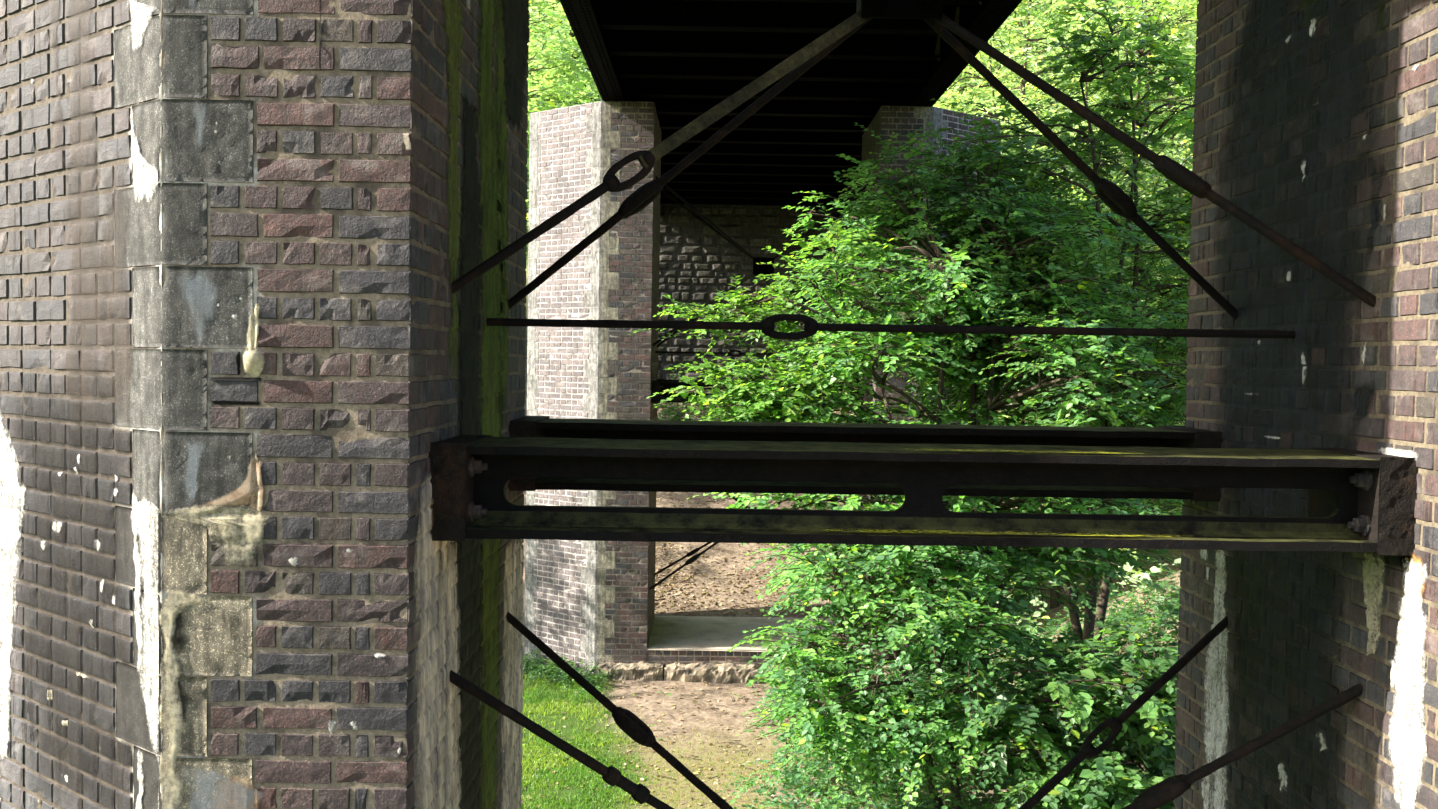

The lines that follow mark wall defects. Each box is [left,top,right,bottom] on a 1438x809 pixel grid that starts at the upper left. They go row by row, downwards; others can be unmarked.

damp [49,0,158,404]
damp [0,416,26,757]
damp [114,475,159,809]
spalling [175,456,264,521]
damp [1200,549,1229,809]
damp [1362,553,1385,654]
damp [1389,560,1427,809]